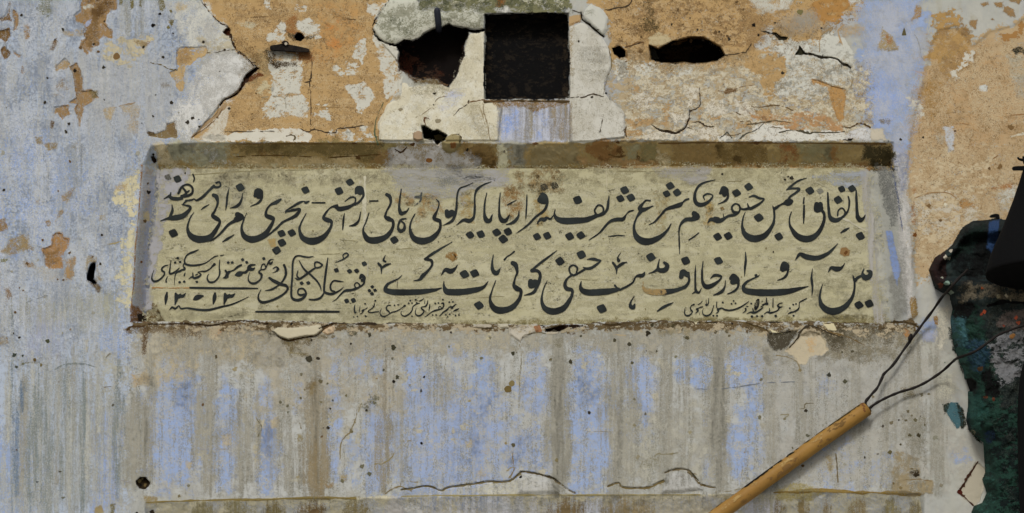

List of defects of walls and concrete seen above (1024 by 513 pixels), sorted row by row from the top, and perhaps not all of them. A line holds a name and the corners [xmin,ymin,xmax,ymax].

peeling [34,0,154,150]
peeling [170,28,280,91]
spalling [647,32,717,65]
peeling [743,32,805,102]
crack [803,19,854,86]
peeling [877,5,979,79]
peeling [103,103,178,139]
crack [652,85,871,141]
peeling [0,188,76,280]
spalling [159,320,914,365]
crack [374,440,576,494]
crack [607,452,742,492]